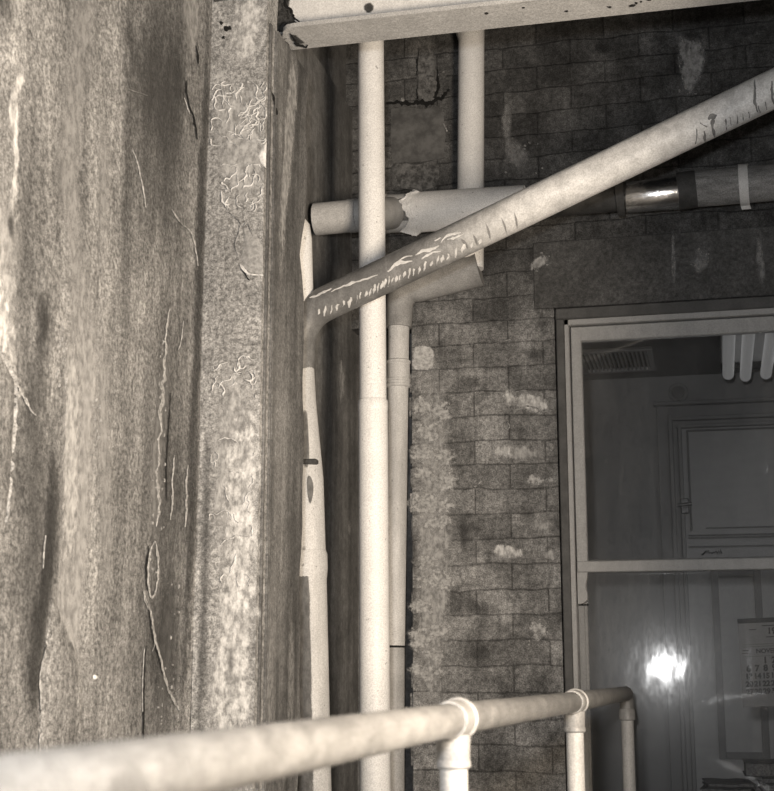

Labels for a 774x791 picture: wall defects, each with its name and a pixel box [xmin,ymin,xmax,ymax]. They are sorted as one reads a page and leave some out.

crack [142,590,181,737]